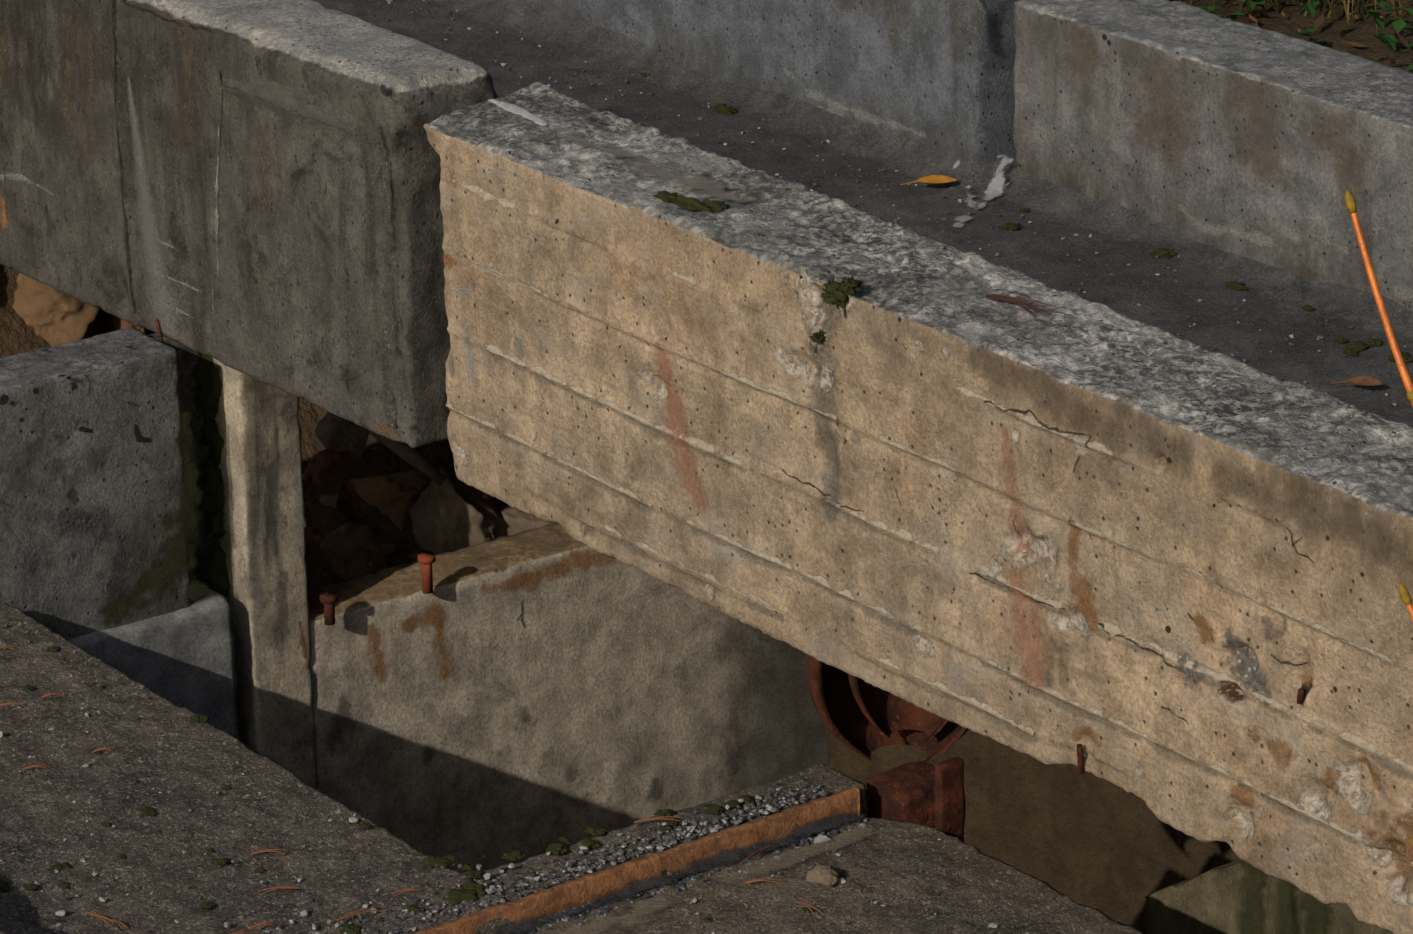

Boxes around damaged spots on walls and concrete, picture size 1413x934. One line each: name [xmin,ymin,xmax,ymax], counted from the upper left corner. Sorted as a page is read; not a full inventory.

spalling [772,268,856,394]
rust [655,345,706,509]
crack [984,400,1091,473]
crack [782,469,863,512]
rust [1068,521,1097,631]
rust [1194,614,1212,643]
spalling [1178,652,1203,687]
spalling [1221,628,1272,705]
spalling [1248,727,1291,766]
spalling [1222,805,1265,839]
spalling [1297,759,1413,906]